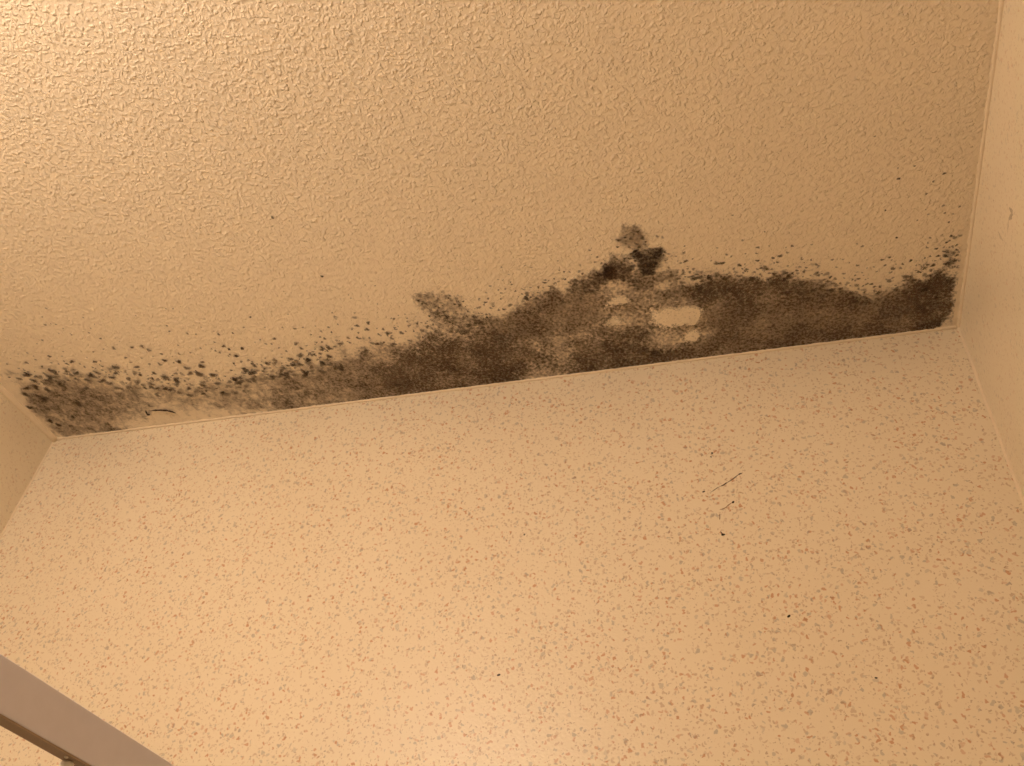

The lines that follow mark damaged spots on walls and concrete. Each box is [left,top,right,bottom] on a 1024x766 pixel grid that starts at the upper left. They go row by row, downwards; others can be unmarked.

damp [7,205,958,437]